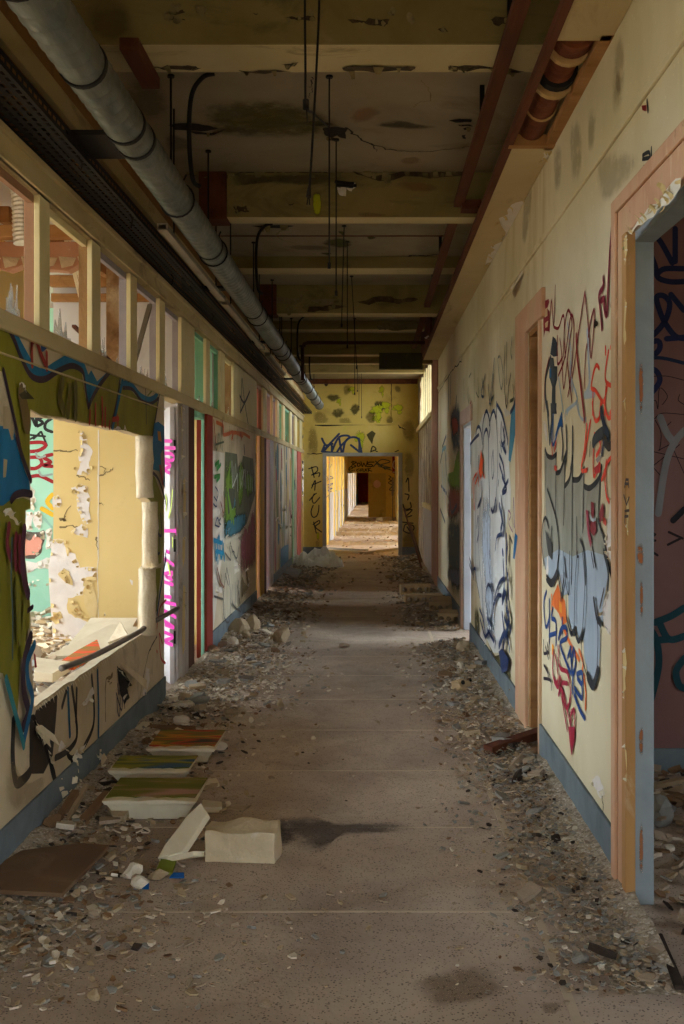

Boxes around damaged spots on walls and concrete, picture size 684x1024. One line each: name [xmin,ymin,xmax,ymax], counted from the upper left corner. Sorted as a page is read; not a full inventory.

spalling [342,66,416,79]
spalling [448,65,493,73]
water stain [213,103,319,135]
crack [345,127,469,152]
peeling [622,178,681,265]
peeling [3,430,106,640]